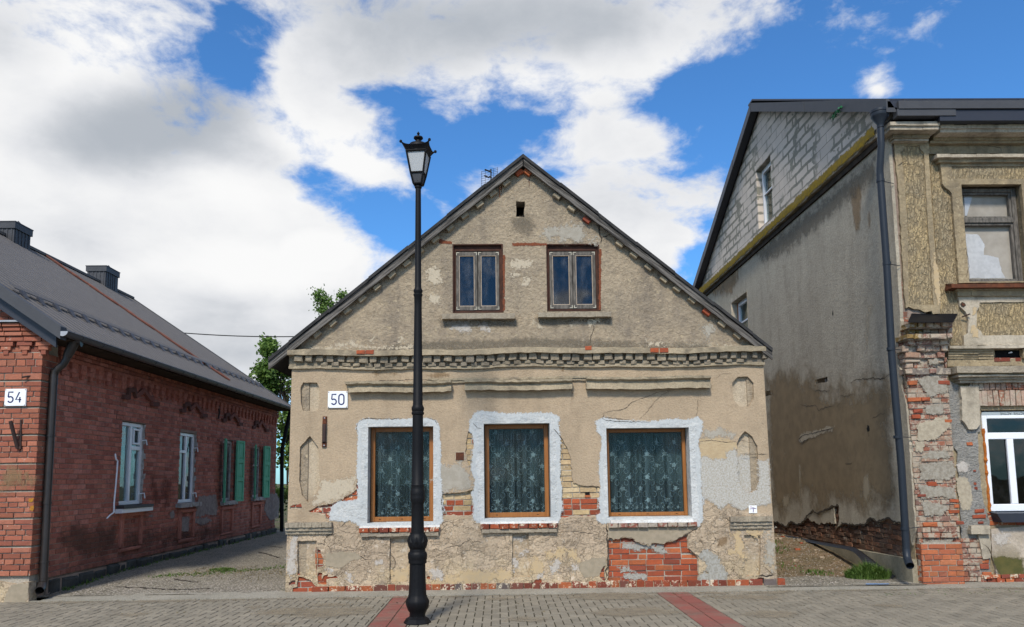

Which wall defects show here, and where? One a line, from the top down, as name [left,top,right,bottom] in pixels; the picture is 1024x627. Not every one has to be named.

crack [602,390,670,422]
flaking render [907,380,930,419]
spalling [465,431,474,468]
peeling [699,438,737,460]
water stain [766,371,895,514]
spalling [559,438,600,519]
spalling [290,482,359,521]
spalling [441,490,474,516]
spalling [773,504,900,527]
peeling [948,499,1012,547]
spalling [289,549,346,592]
spalling [600,534,699,583]